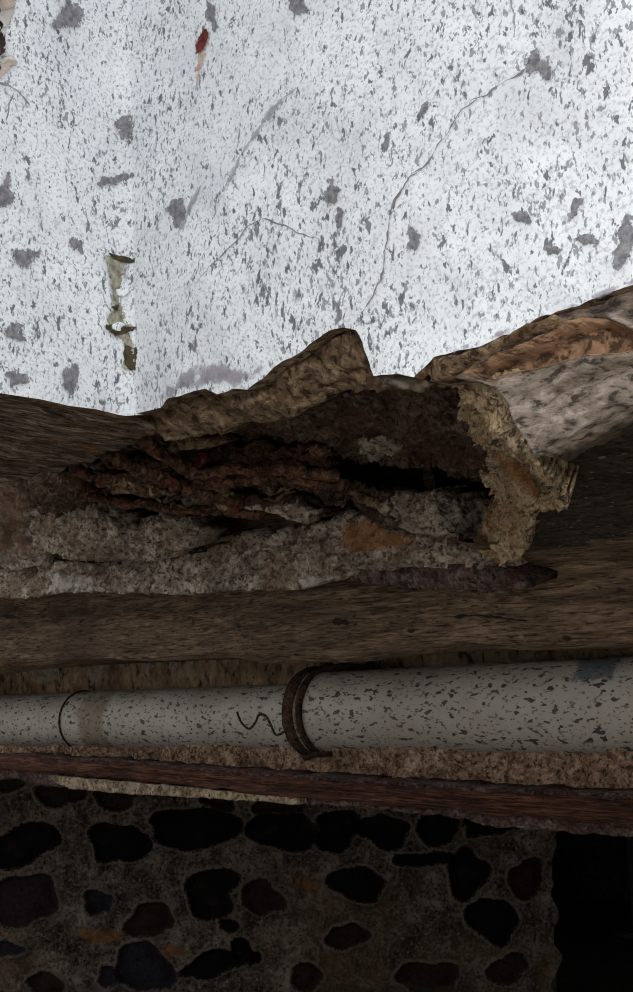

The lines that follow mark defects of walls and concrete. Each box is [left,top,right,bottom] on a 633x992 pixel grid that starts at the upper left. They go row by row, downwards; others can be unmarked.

peeling [0,6,15,36]
crack [0,0,31,120]
corrosion [195,28,209,84]
peeling [0,172,16,208]
peeling [11,248,41,269]
peeling [69,237,84,253]
spalling [105,253,138,370]
spalling [0,291,633,599]